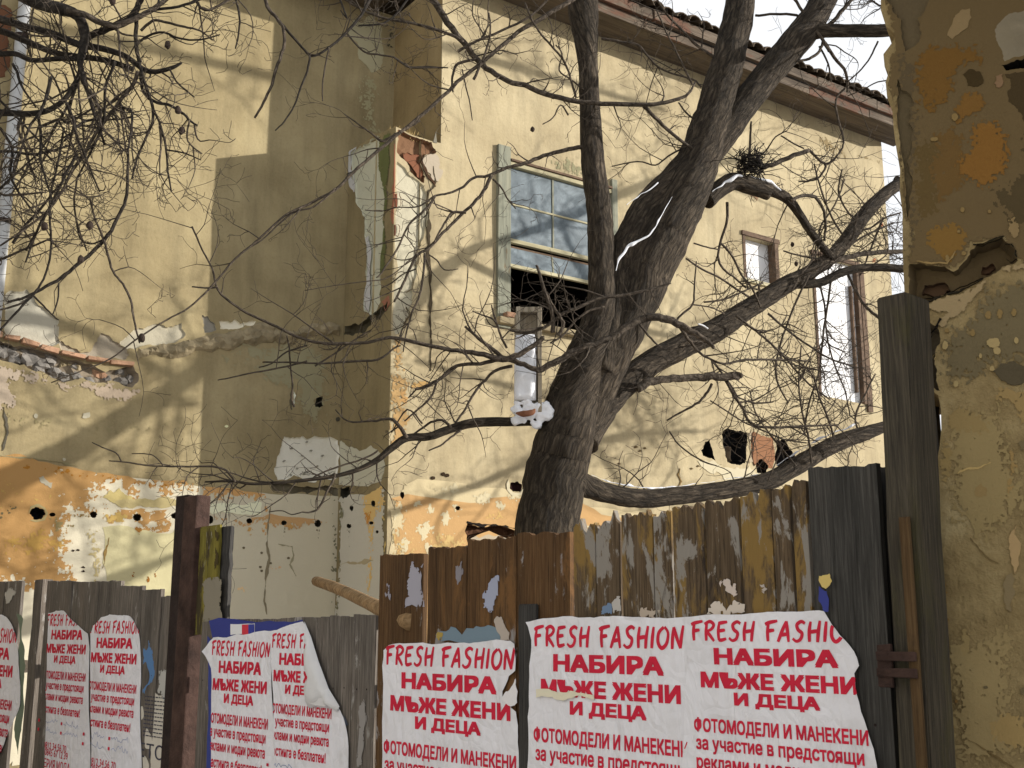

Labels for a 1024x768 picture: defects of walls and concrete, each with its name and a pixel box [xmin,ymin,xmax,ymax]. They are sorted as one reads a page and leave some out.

spalling [1002,59,1024,120]
peeling [897,79,914,217]
peeling [344,125,443,336]
crack [916,236,1004,265]
spalling [908,238,1018,300]
peeling [0,289,185,388]
peeling [202,315,256,333]
spalling [979,338,1024,385]
peeling [271,436,385,499]
spalling [690,428,795,481]
peeling [102,525,174,596]
spalling [465,524,515,542]